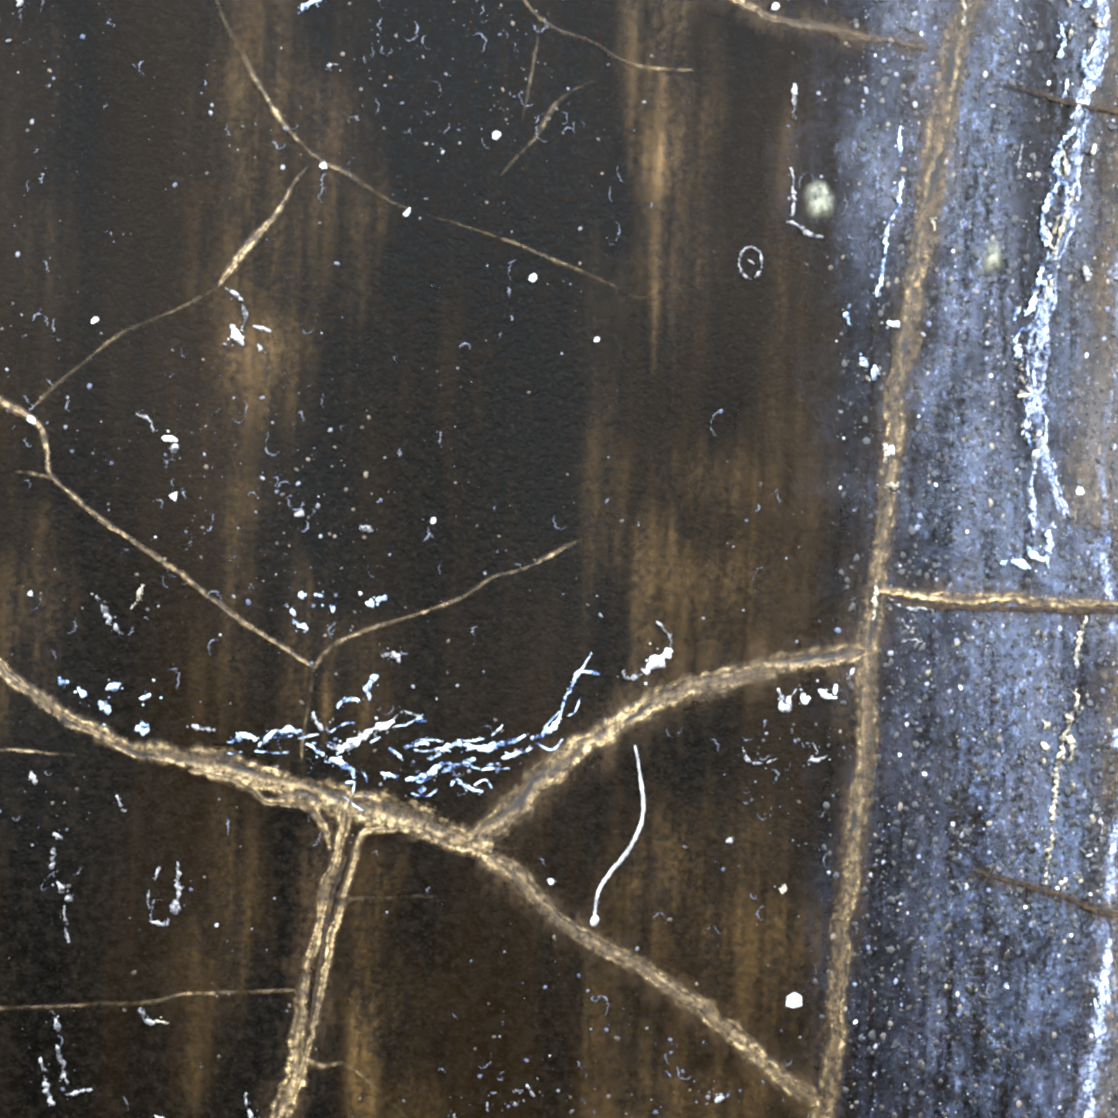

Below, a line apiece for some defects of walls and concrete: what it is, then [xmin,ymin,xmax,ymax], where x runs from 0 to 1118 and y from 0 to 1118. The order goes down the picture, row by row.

crack [730,0,928,51]
crack [252,75,295,138]
crack [315,156,346,174]
crack [219,184,294,286]
crack [505,240,566,265]
crack [0,397,564,669]
crack [814,0,1118,1118]
water stain [847,0,1118,1118]
crack [0,644,869,1118]